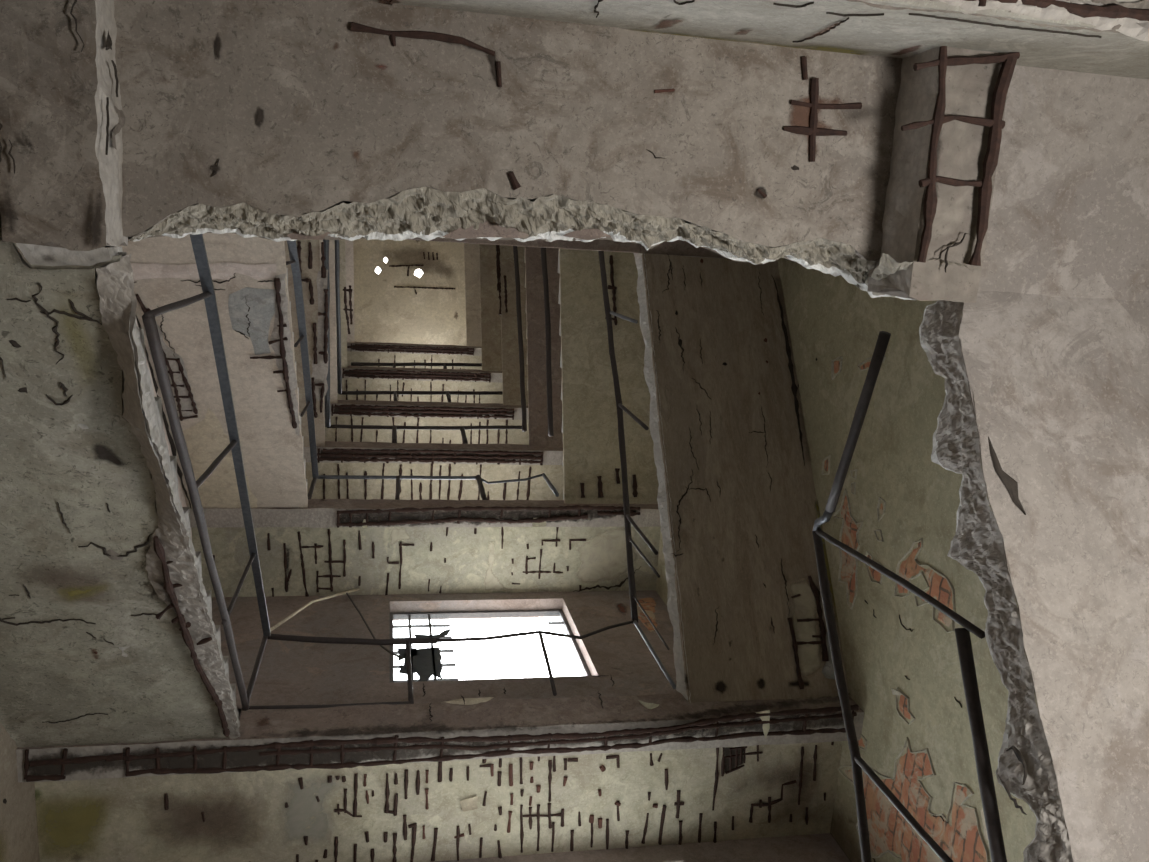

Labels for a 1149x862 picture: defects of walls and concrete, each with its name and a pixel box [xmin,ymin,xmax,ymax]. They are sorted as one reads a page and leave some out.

crack [70,0,119,155]
spalling [351,22,502,87]
crack [673,0,695,8]
crack [773,2,1102,43]
crack [7,282,102,364]
spalling [128,46,1020,703]
crack [988,437,1026,515]
crack [0,584,114,645]
crack [57,502,154,560]
spalling [24,253,859,862]
spalling [919,300,1074,862]
peeling [837,687,990,862]